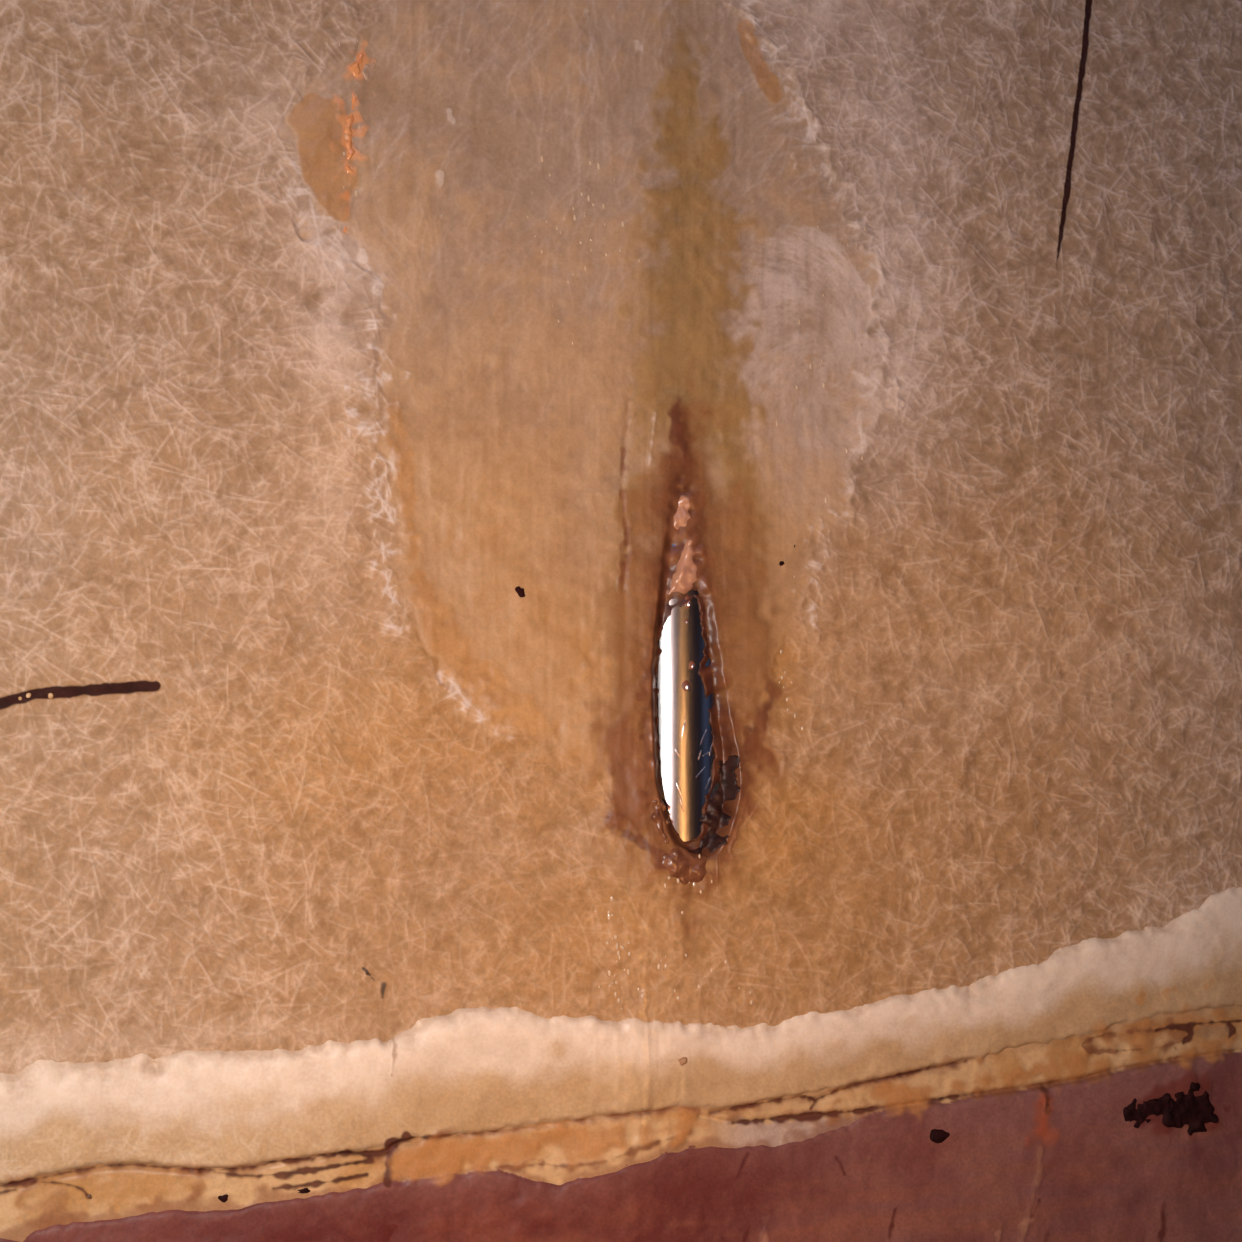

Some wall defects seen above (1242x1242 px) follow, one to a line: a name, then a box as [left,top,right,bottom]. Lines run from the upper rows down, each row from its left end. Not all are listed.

peeling [265,0,641,764]
rust [553,335,821,951]
hole [630,455,760,885]
peeling [727,0,907,637]